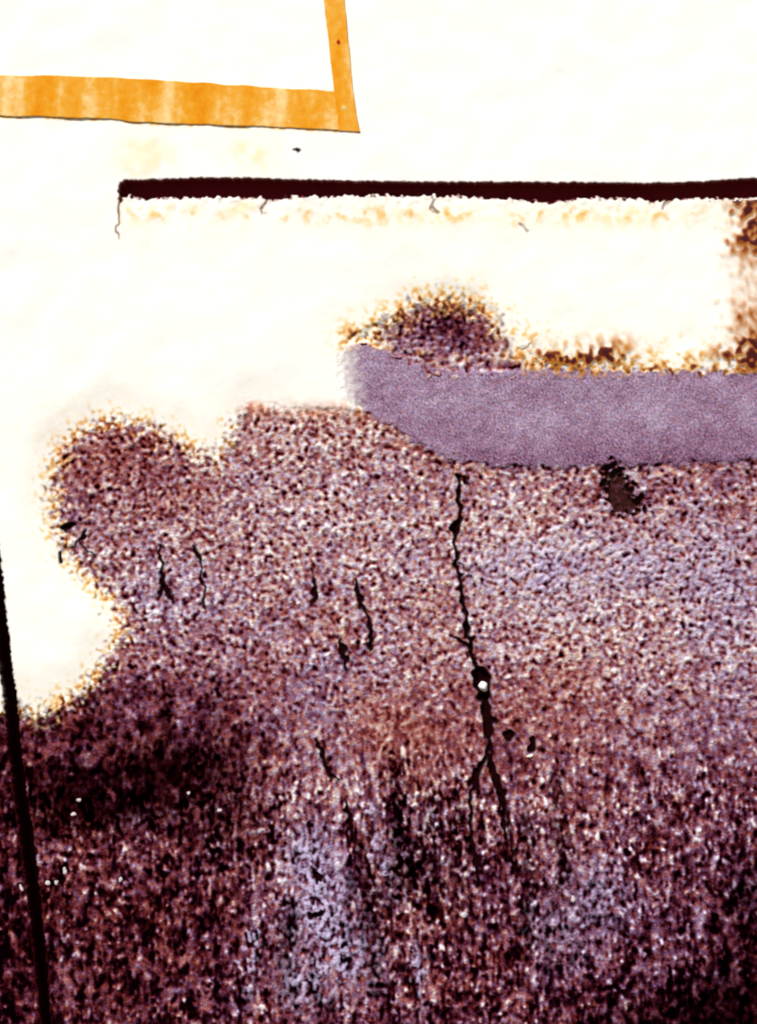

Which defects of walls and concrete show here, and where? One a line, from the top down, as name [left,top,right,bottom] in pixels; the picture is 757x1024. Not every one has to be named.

crack [155,542,175,606]
crack [191,544,208,612]
crack [308,568,320,606]
crack [336,577,376,673]
crack [447,472,480,665]
water stain [514,545,717,589]
water stain [28,676,246,844]
water stain [275,750,465,1001]
crack [467,701,521,891]
water stain [518,802,538,952]
water stain [547,771,575,885]
water stain [243,930,260,972]